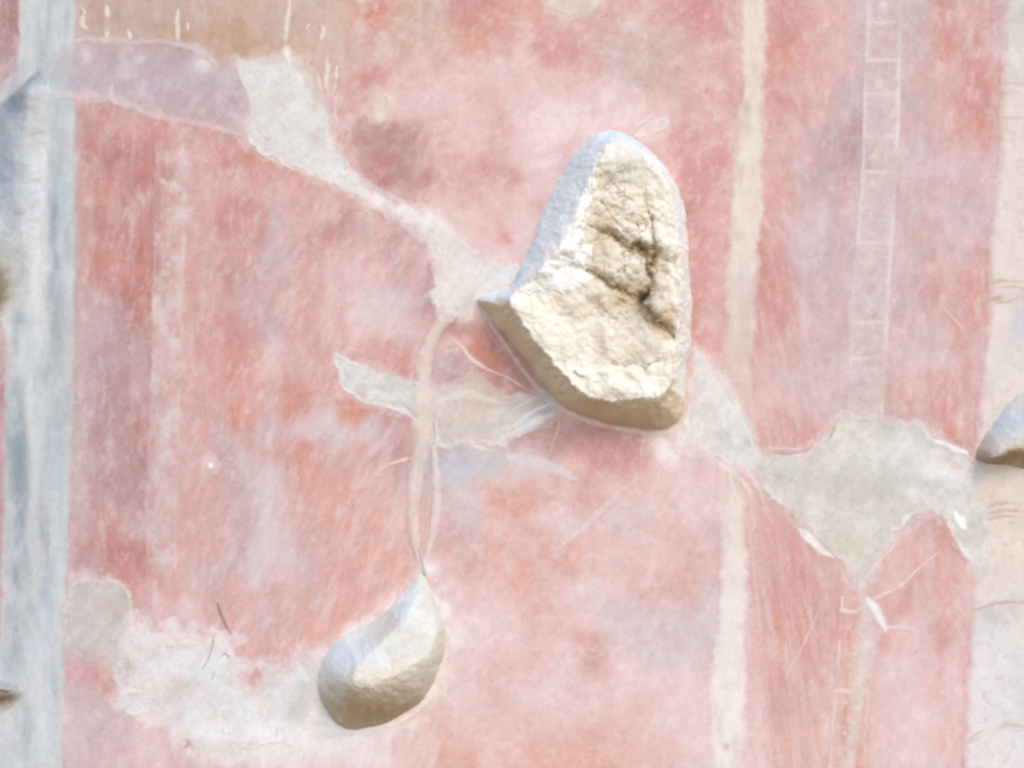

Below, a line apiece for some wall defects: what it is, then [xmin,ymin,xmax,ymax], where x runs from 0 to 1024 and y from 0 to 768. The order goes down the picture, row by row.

flaking render [234,56,351,194]
peeling [358,82,402,131]
flaking render [328,346,414,420]
crack [376,310,458,577]
flaking render [429,365,558,449]
flaking render [644,336,1001,593]